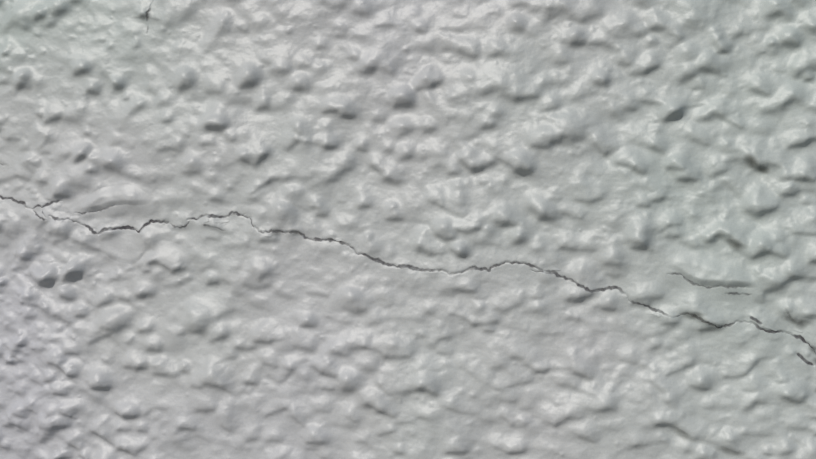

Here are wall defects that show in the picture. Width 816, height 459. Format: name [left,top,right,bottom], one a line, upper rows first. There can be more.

crack [0,196,57,220]
crack [85,212,248,234]
crack [300,233,432,271]
crack [461,262,619,292]
crack [751,317,813,365]